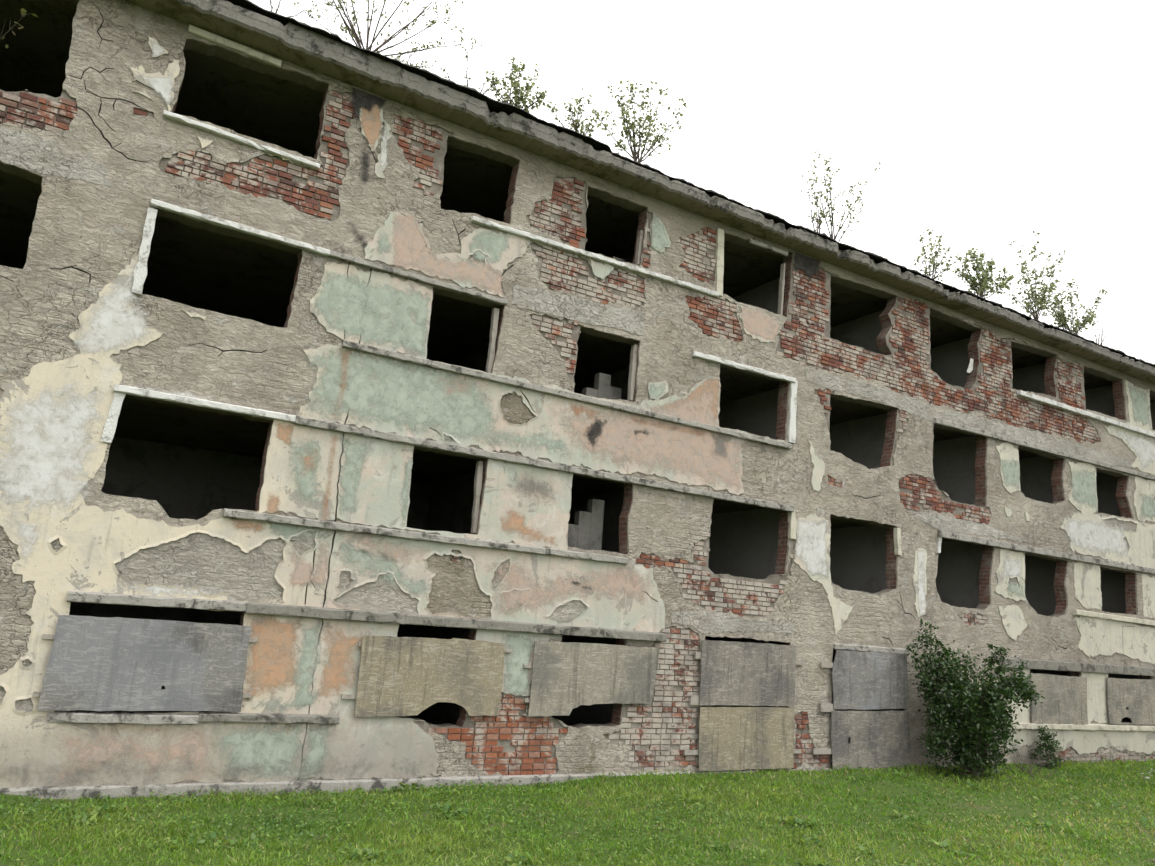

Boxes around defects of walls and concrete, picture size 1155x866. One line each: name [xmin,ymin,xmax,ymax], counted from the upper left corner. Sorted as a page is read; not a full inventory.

spalling [0,89,83,132]
crack [67,10,148,163]
spalling [158,91,453,221]
spalling [364,177,1155,680]
peeling [112,528,320,604]
peeling [331,550,532,620]
spalling [414,692,568,775]
spalling [603,625,701,771]
spalling [791,711,832,769]
flaking render [1005,669,1155,763]